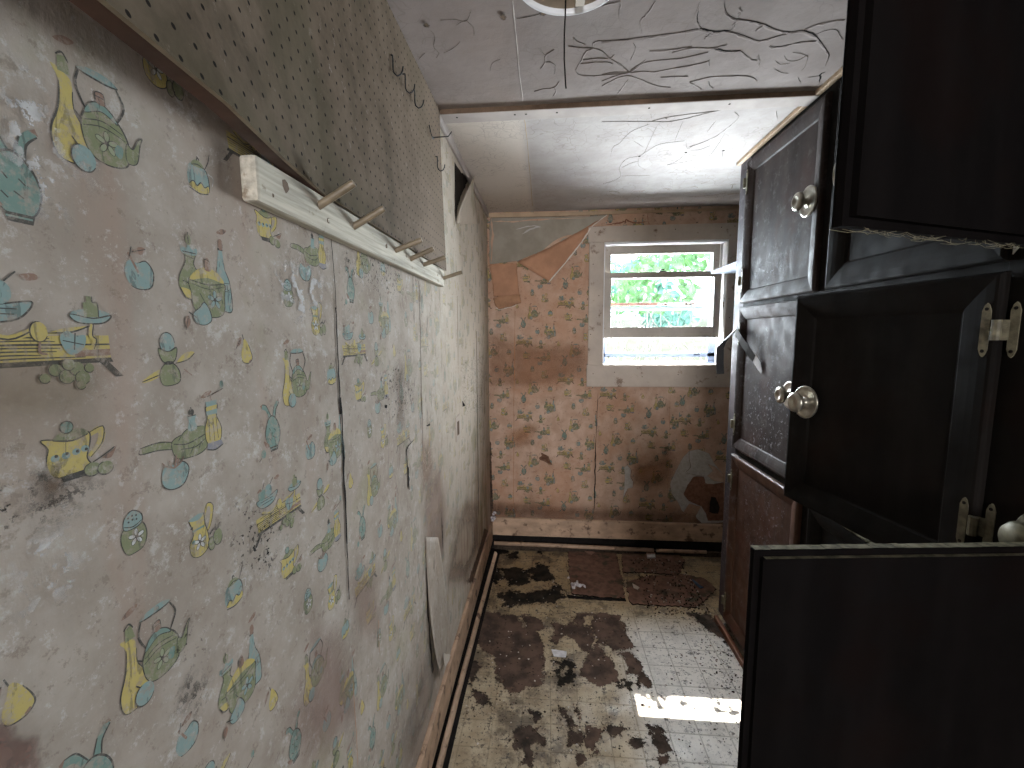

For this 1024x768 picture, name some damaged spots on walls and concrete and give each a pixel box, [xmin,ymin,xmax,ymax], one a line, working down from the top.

crack [534,0,844,184]
peeling [490,215,607,310]
flaking render [670,449,724,523]
damp [233,507,277,570]
peeling [500,550,556,587]
peeling [426,537,450,674]
peeling [550,612,648,692]
peeling [468,681,493,711]
peeling [527,708,545,723]
peeling [566,707,587,767]
peeling [601,722,647,749]